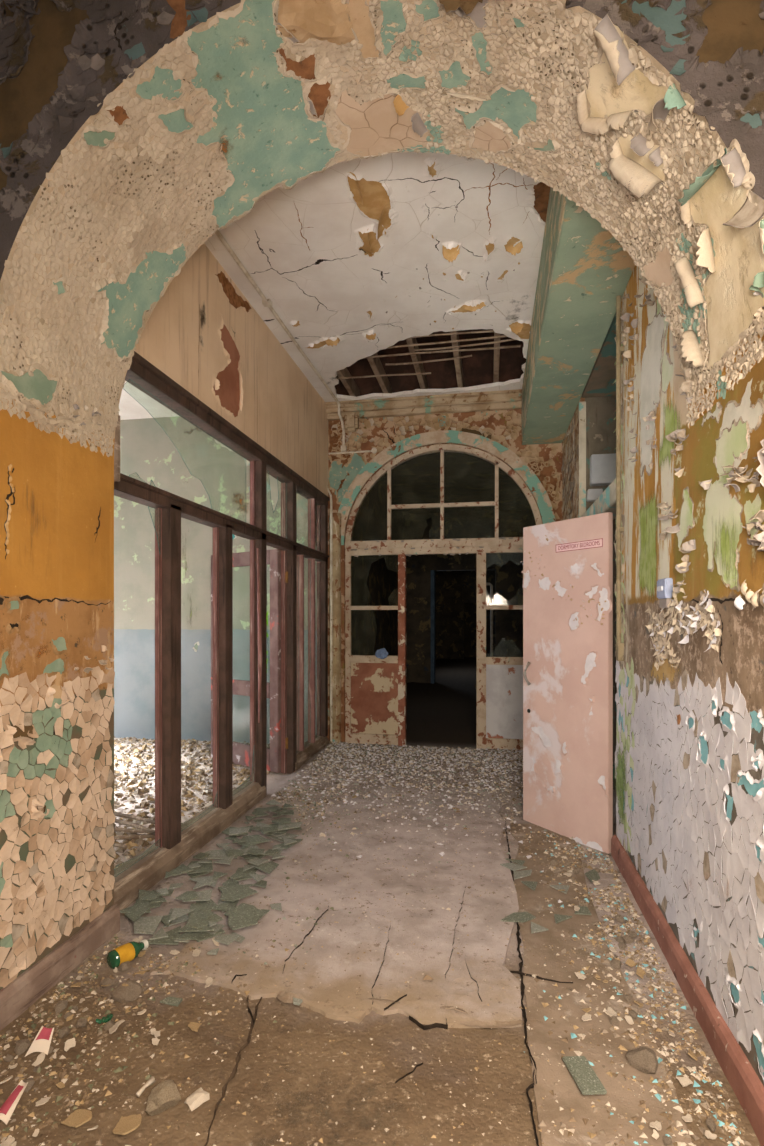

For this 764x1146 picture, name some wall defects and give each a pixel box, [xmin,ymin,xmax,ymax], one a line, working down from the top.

crack [252,203,401,347]
peeling [0,0,764,612]
crack [379,163,529,321]
crack [4,464,15,559]
peeling [521,301,764,1082]
peeling [0,595,116,988]
spalling [66,967,118,1021]
crack [204,974,263,1146]
crack [372,925,448,1030]
crack [510,922,573,1146]
spalling [649,1121,662,1140]
spalling [676,1076,693,1087]